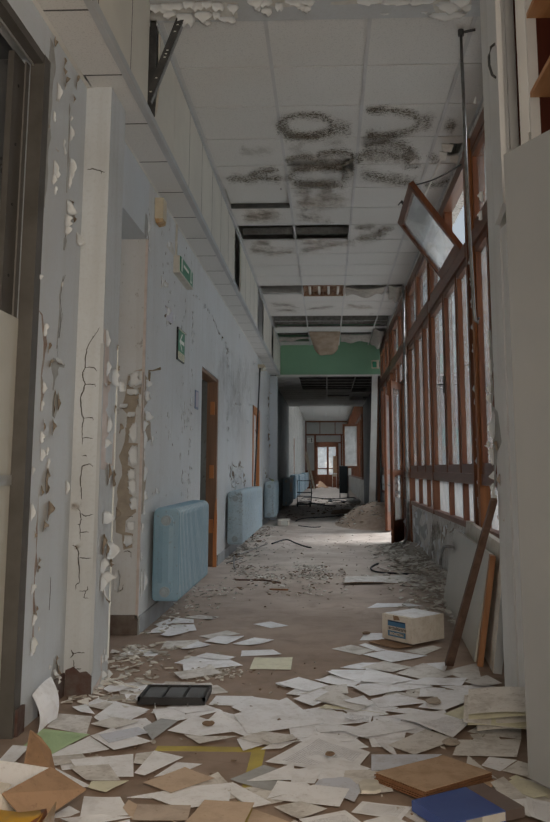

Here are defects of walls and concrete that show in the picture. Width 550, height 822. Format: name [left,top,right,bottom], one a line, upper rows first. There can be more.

peeling [150,0,316,29]
peeling [330,0,472,21]
peeling [44,36,85,251]
leakage [226,107,431,192]
peeling [30,279,65,656]
crack [72,329,99,597]
peeling [100,329,154,603]